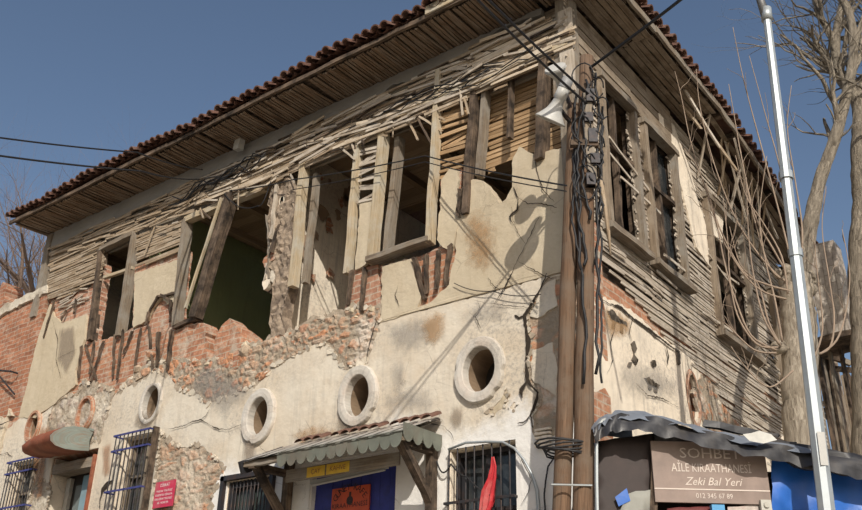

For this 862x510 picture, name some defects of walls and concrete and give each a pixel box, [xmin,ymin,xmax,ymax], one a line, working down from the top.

crack [470,154,557,428]
water stain [425,316,441,340]
spalling [627,341,638,367]
flaking render [46,301,382,445]
spalling [644,360,660,393]
crack [166,409,239,430]
flaking render [150,429,227,510]